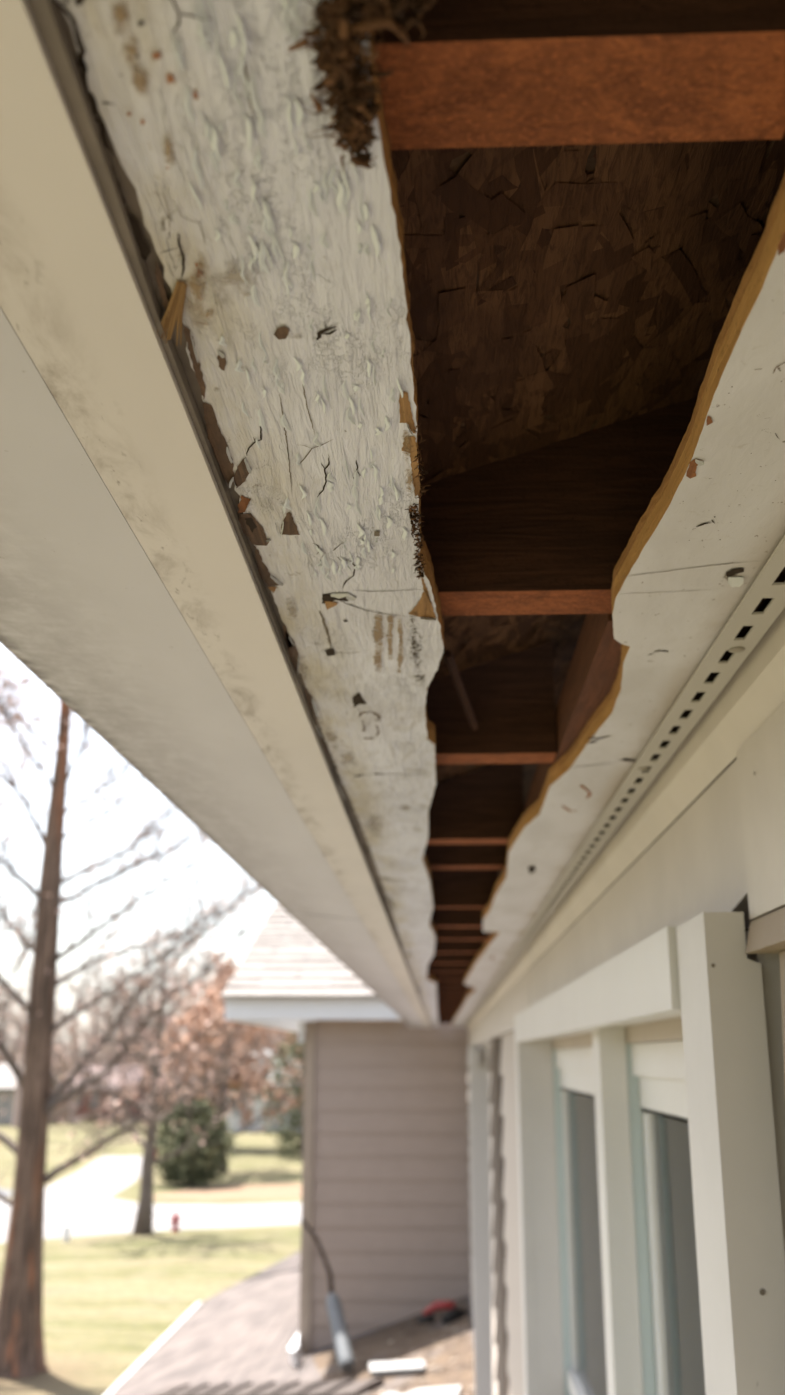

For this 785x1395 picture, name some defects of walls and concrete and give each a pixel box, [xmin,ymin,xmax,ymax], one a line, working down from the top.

crack [171,0,213,32]
crack [53,0,115,157]
peeling [777,231,785,256]
peeling [686,459,704,479]
peeling [724,568,744,587]
peeling [409,577,436,620]
peeling [352,693,366,707]